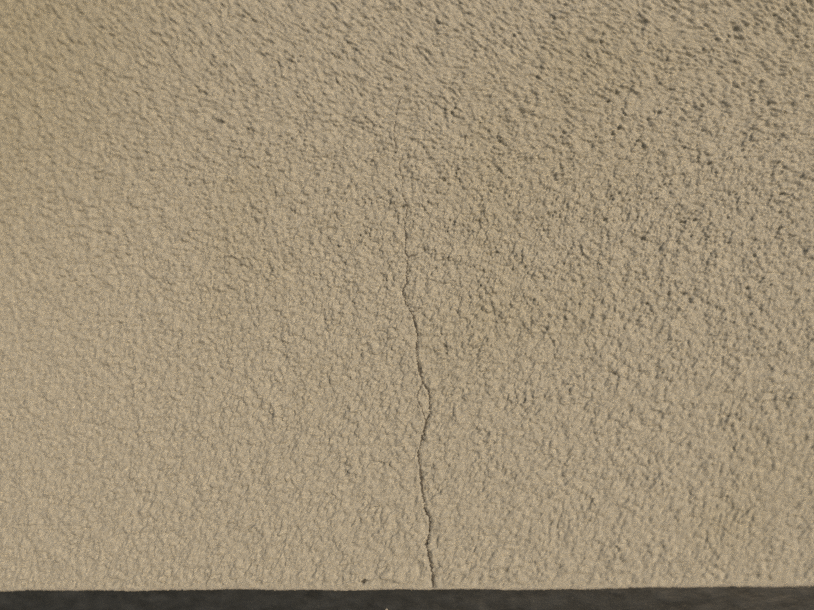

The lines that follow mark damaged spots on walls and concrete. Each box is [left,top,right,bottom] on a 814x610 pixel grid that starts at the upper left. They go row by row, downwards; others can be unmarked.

crack [393,95,435,587]